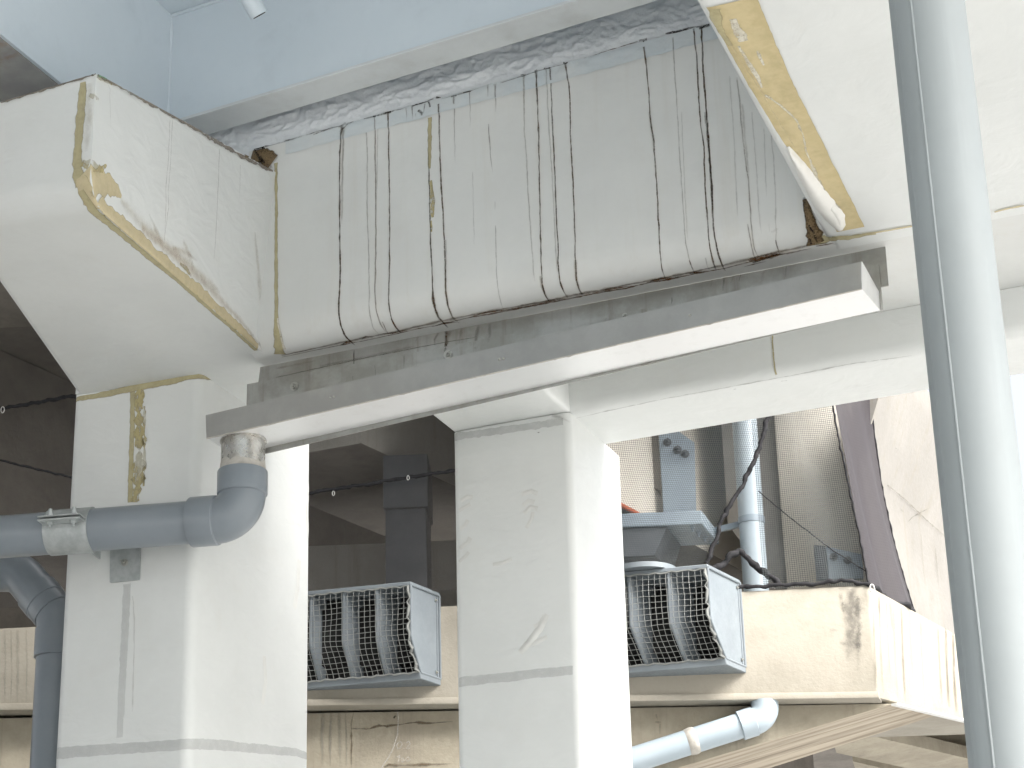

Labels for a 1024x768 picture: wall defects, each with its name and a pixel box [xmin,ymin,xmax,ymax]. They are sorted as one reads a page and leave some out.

peeling [72,74,286,354]
crack [666,24,710,34]
peeling [706,0,912,246]
peeling [76,374,211,503]